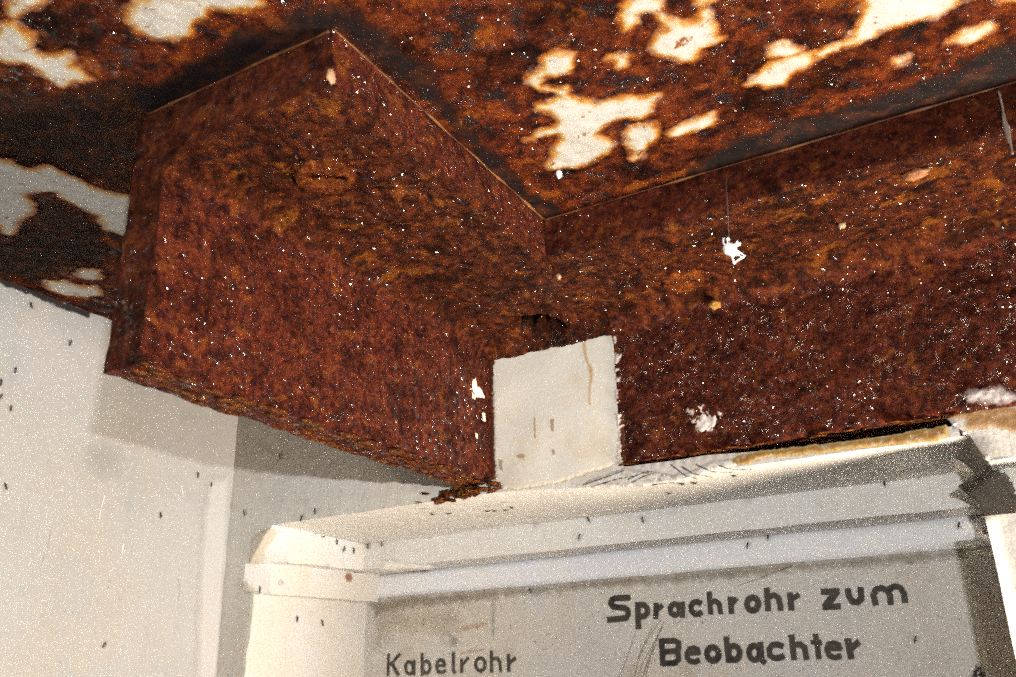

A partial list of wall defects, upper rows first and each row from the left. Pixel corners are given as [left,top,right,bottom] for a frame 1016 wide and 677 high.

peeling [0,0,98,89]
peeling [122,0,268,43]
peeling [615,0,728,64]
peeling [741,0,970,90]
peeling [942,20,999,47]
peeling [520,47,719,171]
peeling [0,158,130,236]
corrosion [901,168,931,182]
corrosion [415,360,503,505]
peeling [492,335,1016,535]
corrosion [949,407,1016,432]
leakage [964,385,1016,405]